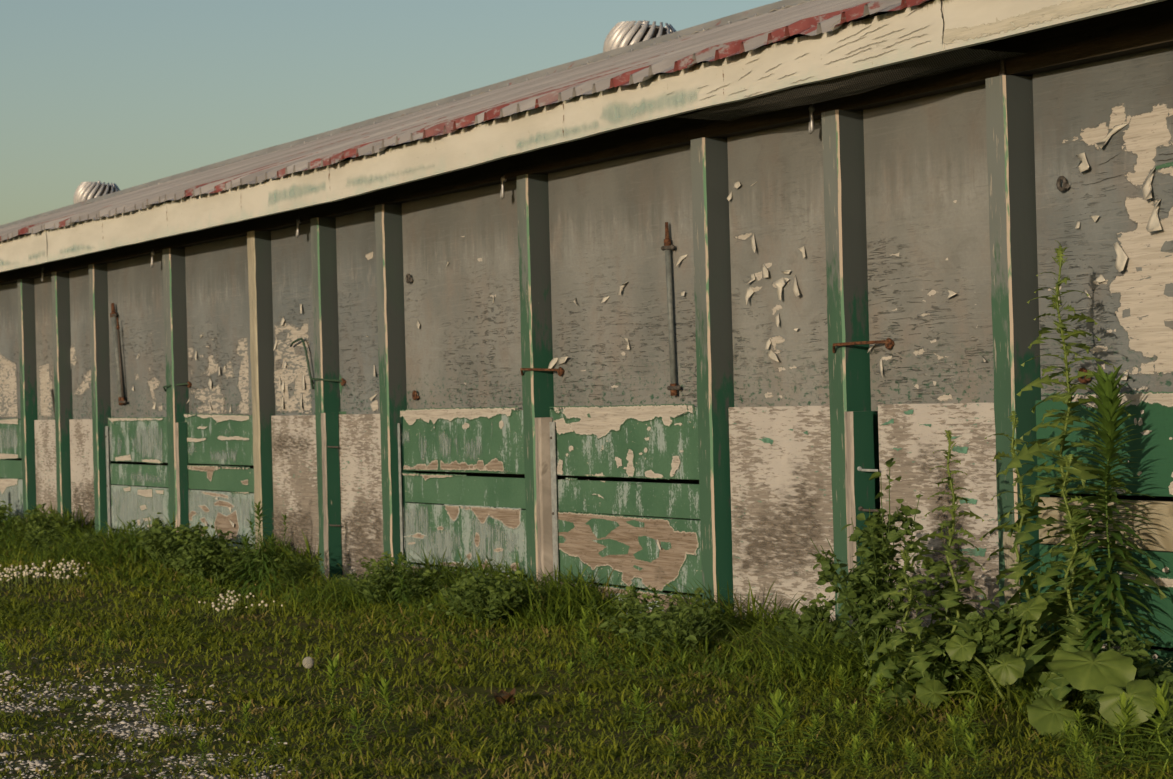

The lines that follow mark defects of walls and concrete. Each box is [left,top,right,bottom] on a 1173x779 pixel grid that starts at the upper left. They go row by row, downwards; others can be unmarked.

peeling [734,232,756,253]
peeling [1060,102,1173,435]
peeling [745,263,800,372]
peeling [273,304,312,414]
peeling [0,353,18,460]
peeling [400,406,519,481]
peeling [1042,392,1103,409]
peeling [0,478,18,515]
peeling [403,504,521,580]
peeling [549,404,700,619]
peeling [1116,567,1173,589]